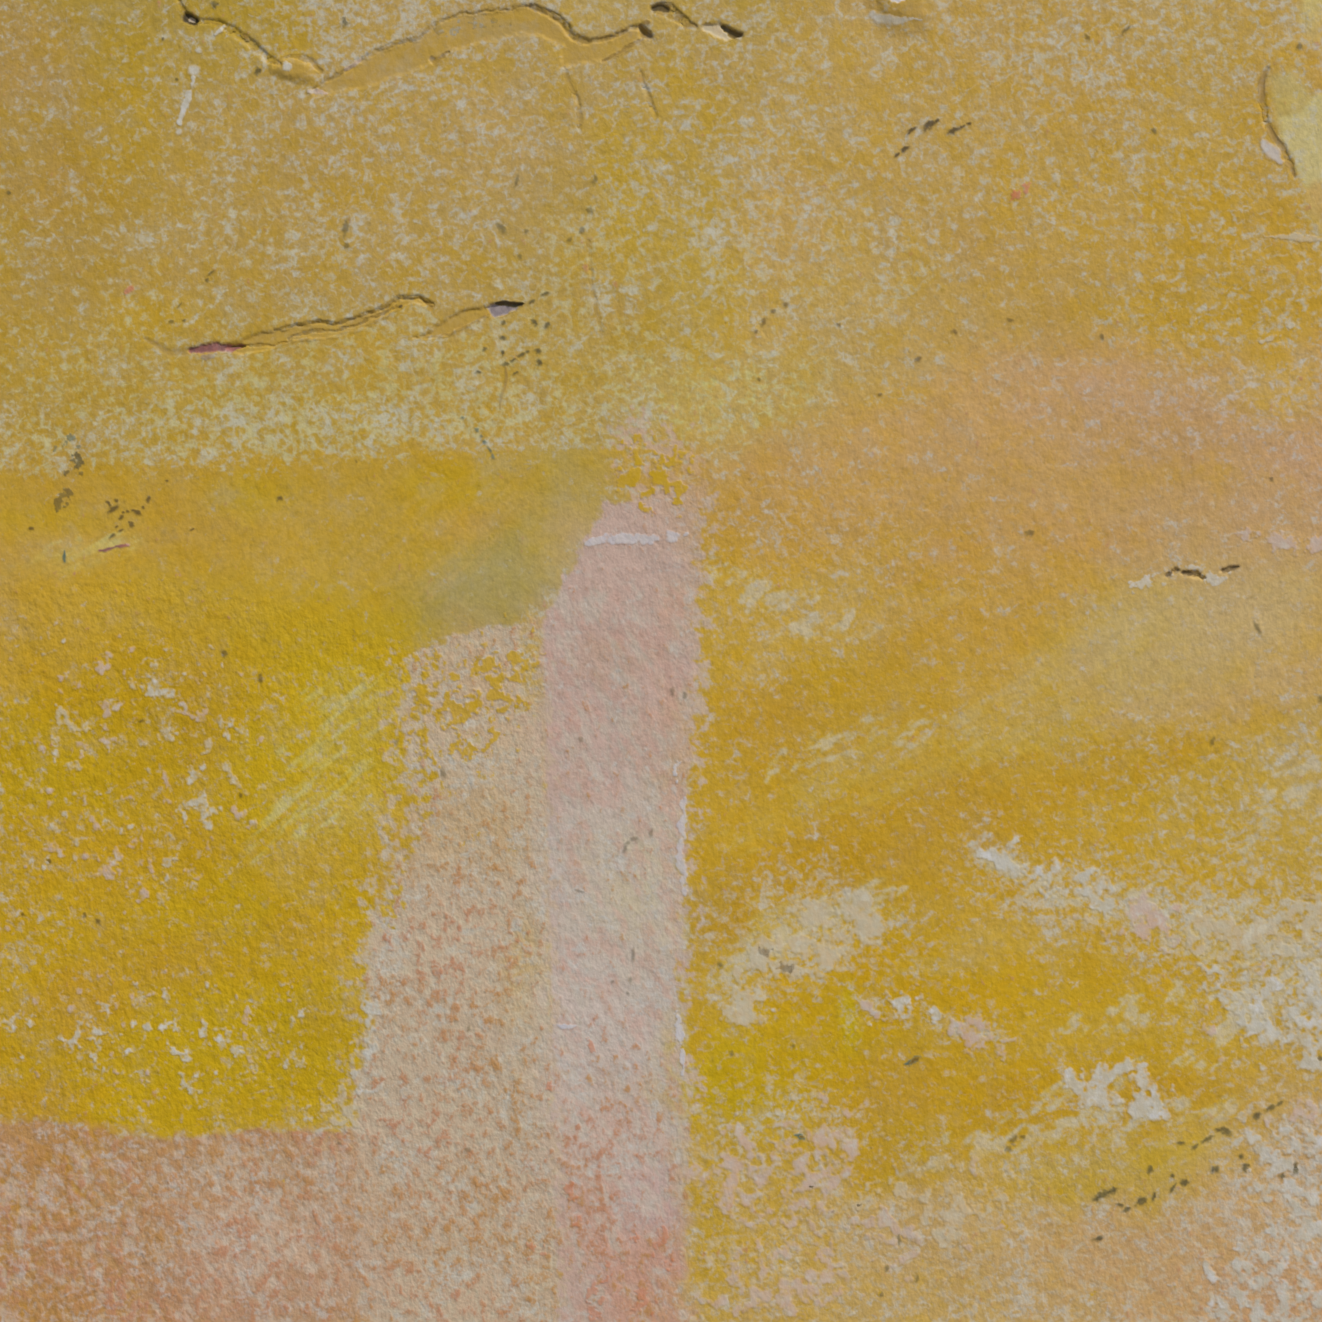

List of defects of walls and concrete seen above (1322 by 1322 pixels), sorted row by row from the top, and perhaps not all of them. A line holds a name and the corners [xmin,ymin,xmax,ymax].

crack [178,1,745,127]
crack [143,295,434,361]
peeling [615,433,696,519]
crack [1123,555,1240,594]
peeling [398,628,547,767]
peeling [0,633,265,915]
peeling [55,969,308,1120]
peeling [305,993,385,1140]
peeling [711,886,900,1028]
peeling [856,982,1019,1063]
peeling [962,828,1322,1322]
peeling [662,1087,1023,1322]